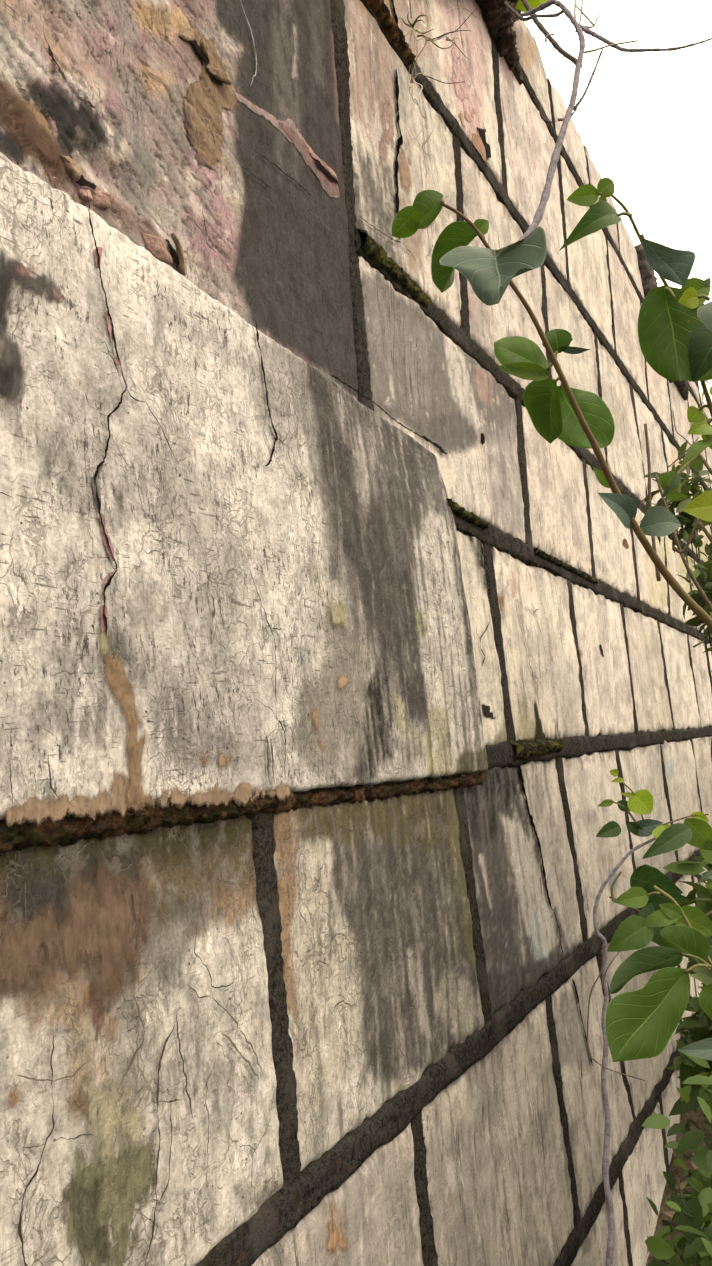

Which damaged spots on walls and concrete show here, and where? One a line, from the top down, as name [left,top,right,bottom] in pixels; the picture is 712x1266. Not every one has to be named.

damp [0,131,35,170]
damp [0,252,66,401]
damp [17,79,108,159]
spalling [60,155,114,209]
crack [87,193,179,645]
spalling [141,231,186,276]
peeling [178,24,340,198]
crack [256,324,284,466]
crack [0,1035,93,1266]
crack [118,927,263,1266]